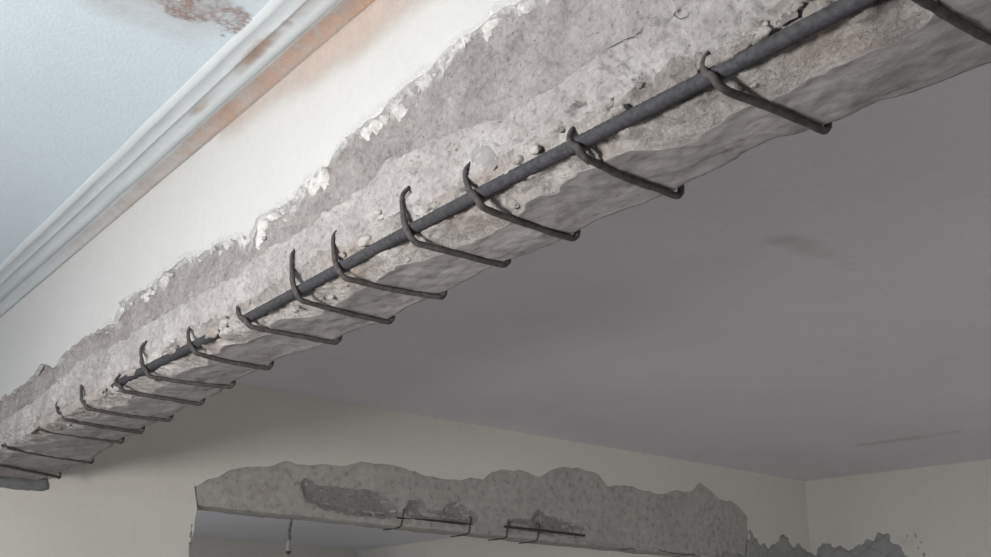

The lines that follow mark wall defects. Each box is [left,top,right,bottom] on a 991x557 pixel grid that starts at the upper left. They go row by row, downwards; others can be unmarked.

corrosion [154,0,251,36]
flaking render [0,0,941,463]
spalling [0,477,49,491]
flaking render [194,461,748,557]